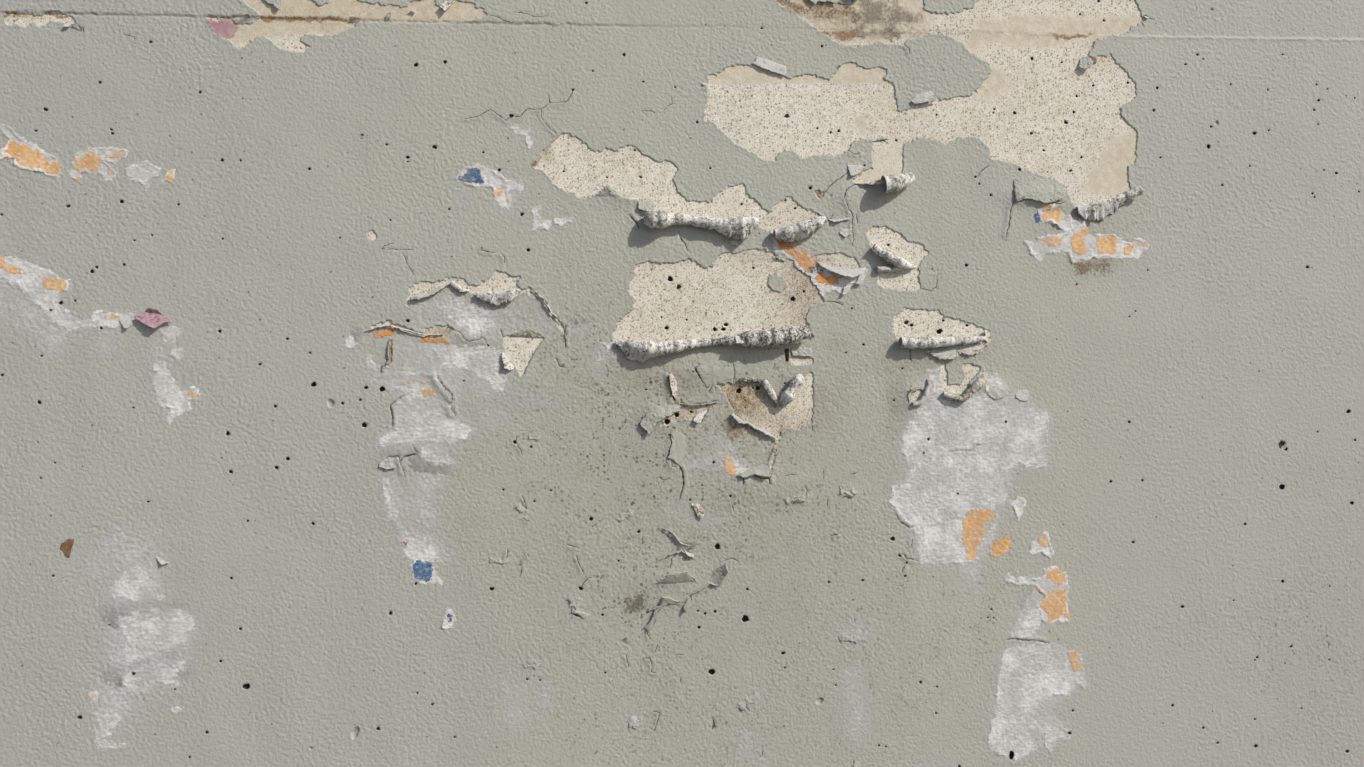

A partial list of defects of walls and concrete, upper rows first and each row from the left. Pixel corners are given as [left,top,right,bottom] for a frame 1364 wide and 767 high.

peeling [207,0,487,52]
peeling [703,0,1150,223]
peeling [407,270,564,331]
peeling [534,134,929,478]
peeling [365,321,453,367]
peeling [502,328,544,375]
peeling [892,308,1030,406]
peeling [379,458,398,469]